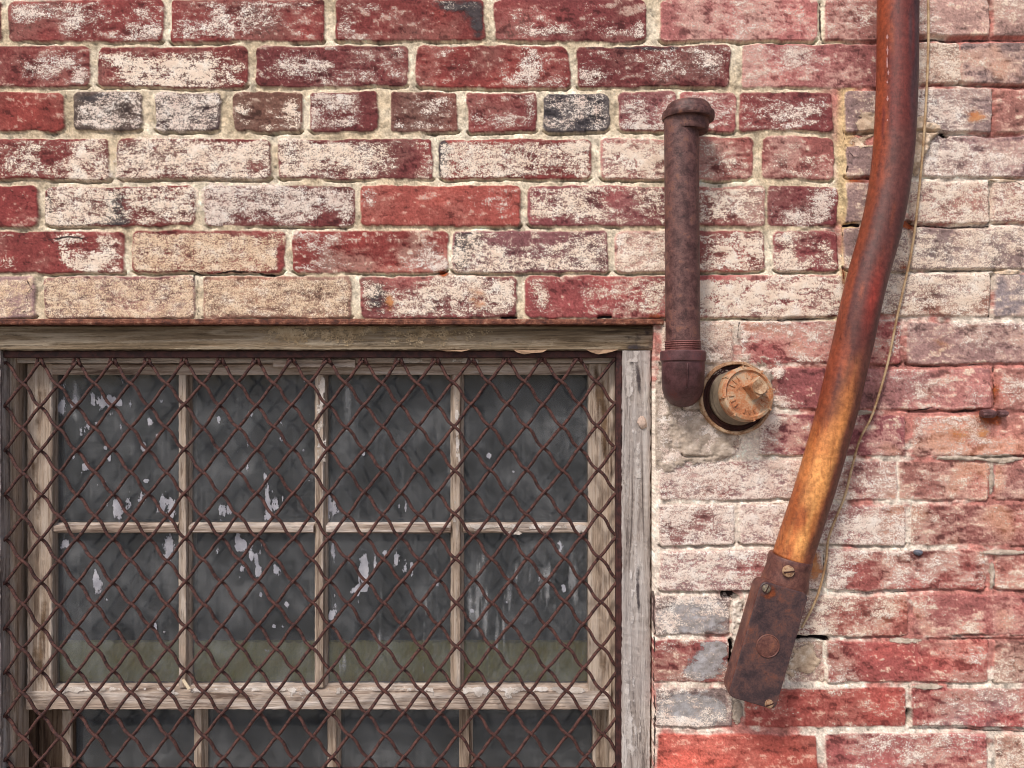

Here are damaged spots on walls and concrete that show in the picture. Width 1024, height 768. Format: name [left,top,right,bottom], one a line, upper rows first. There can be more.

crack [187,270,276,315]